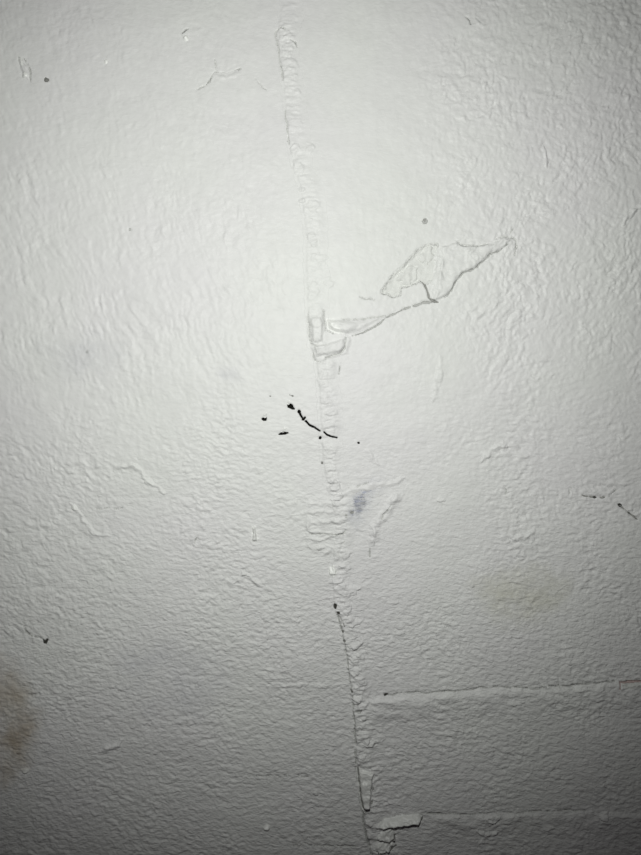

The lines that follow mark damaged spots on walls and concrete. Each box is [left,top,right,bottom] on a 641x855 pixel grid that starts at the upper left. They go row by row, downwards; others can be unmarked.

crack [198,0,438,855]
peeling [380,200,583,303]